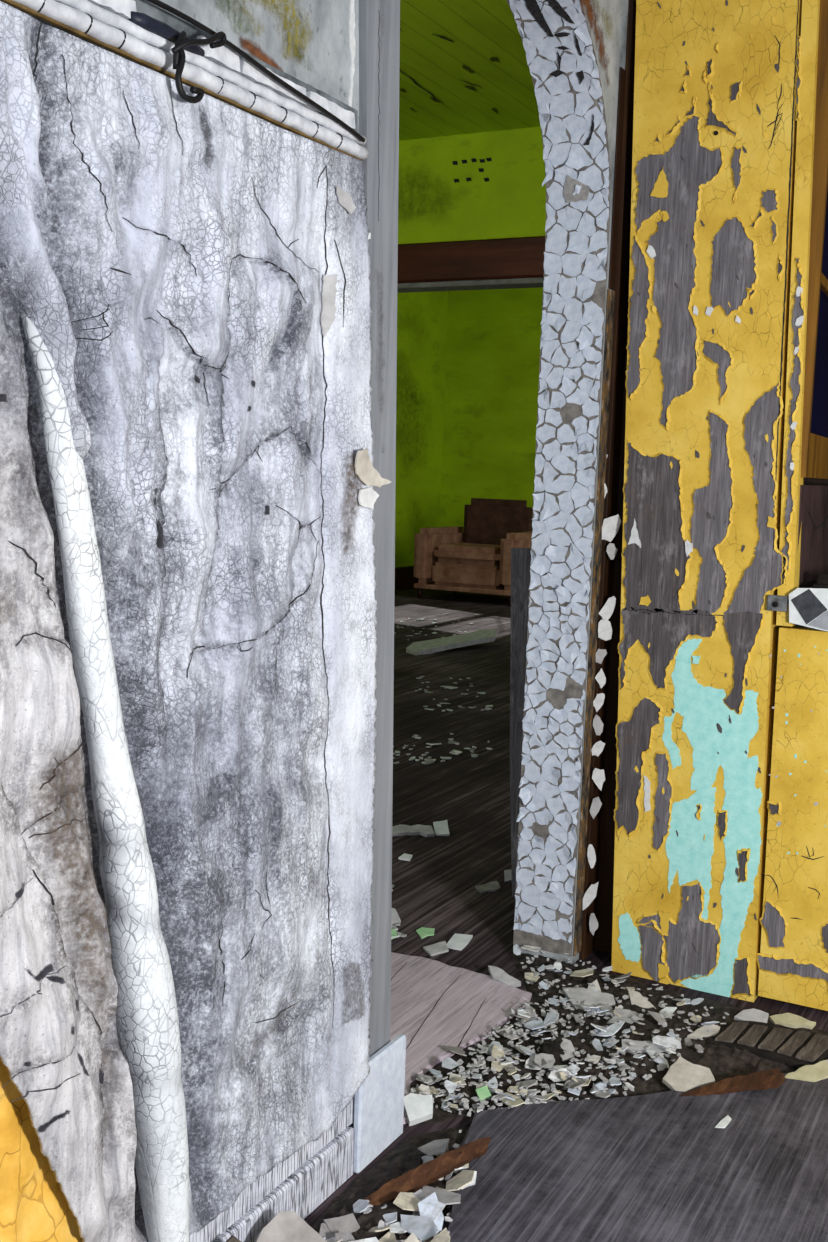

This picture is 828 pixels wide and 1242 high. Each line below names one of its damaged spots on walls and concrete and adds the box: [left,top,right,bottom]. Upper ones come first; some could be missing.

crack [73,304,113,341]
crack [145,310,229,406]
crack [507,0,610,957]
crack [187,76,346,971]
peeling [590,27,828,998]
crack [9,541,57,608]
crack [16,632,73,653]
crack [22,738,85,838]
peeling [587,844,596,868]
crack [1,869,54,917]
peeling [583,882,599,936]
crack [0,966,66,1017]